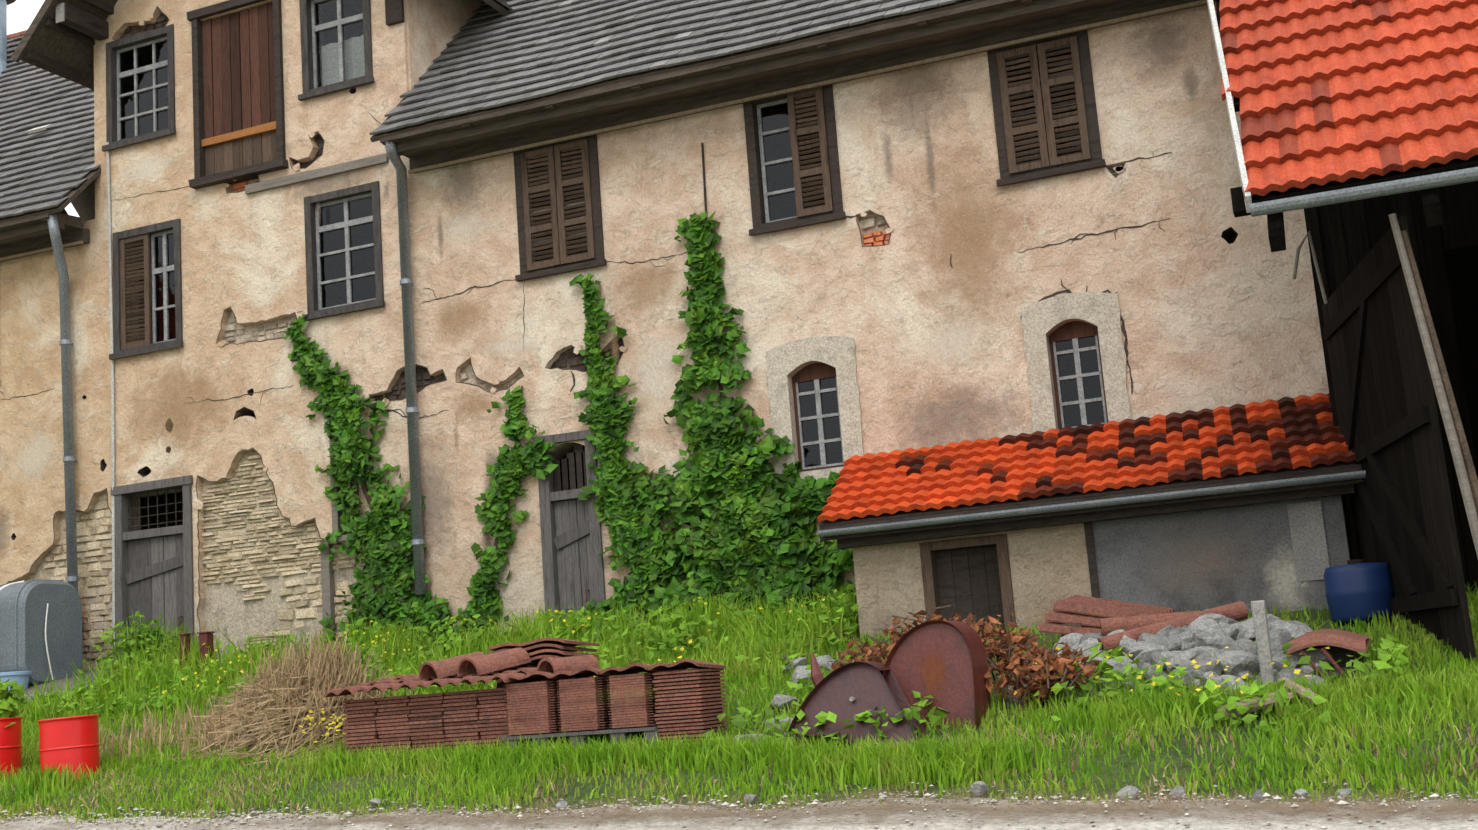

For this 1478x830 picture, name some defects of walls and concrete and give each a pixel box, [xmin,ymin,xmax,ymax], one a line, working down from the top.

flaking render [112,7,170,40]
flaking render [856,210,893,247]
crack [1023,218,1170,252]
flaking render [216,306,297,347]
flaking render [545,336,627,372]
crack [1020,280,1133,394]
flaking render [361,357,524,407]
flaking render [192,448,369,664]
flaking render [6,488,112,670]